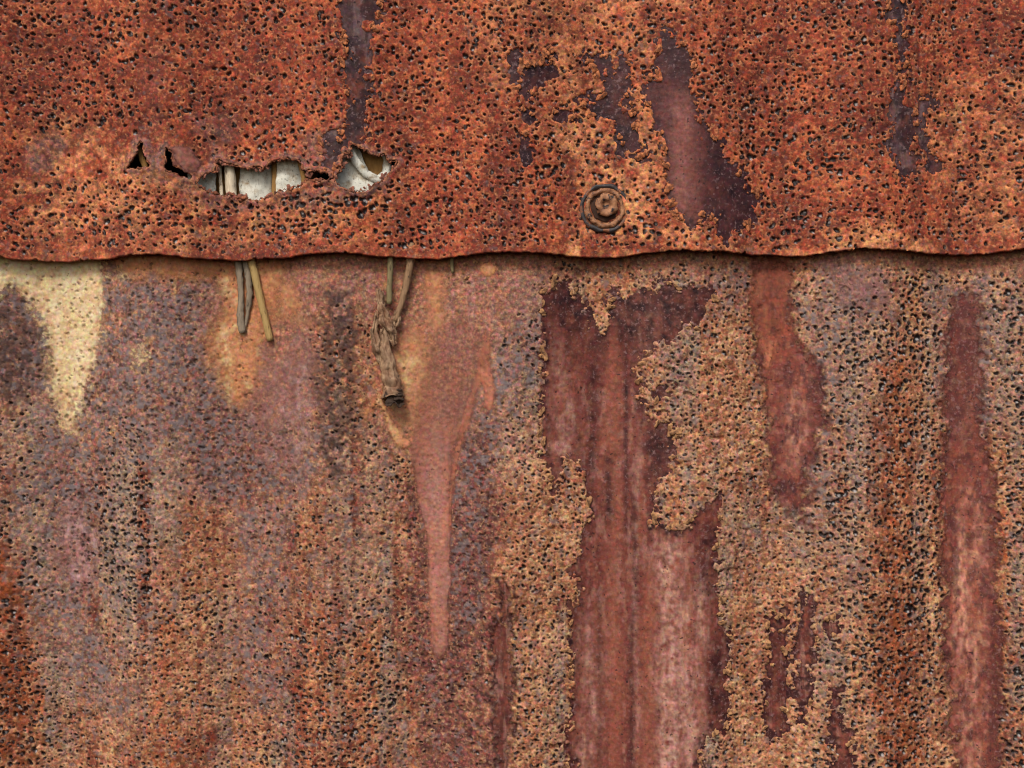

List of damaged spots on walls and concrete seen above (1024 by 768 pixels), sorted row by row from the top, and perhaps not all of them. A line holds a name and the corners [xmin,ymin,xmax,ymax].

corrosion [170,146,202,172]
corrosion [313,0,388,171]
corrosion [504,20,764,247]
corrosion [877,0,945,189]
corrosion [113,254,304,403]
corrosion [425,270,445,330]
corrosion [746,259,830,529]
corrosion [363,329,495,659]
corrosion [533,273,737,768]
corrosion [935,292,1011,768]
corrosion [482,578,521,768]
corrosion [758,586,822,745]